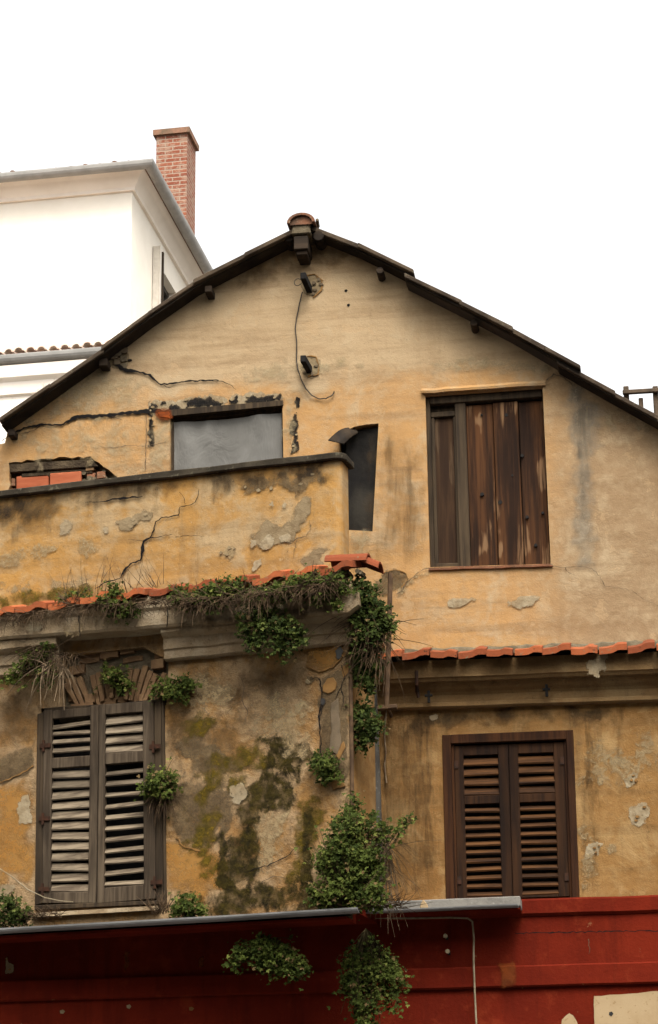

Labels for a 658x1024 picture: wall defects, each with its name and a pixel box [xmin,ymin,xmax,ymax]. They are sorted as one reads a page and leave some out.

crack [2,364,235,471]
flaking render [147,391,300,454]
damp [0,497,58,524]
crack [90,490,199,588]
spalling [241,472,328,572]
peeling [16,795,32,824]
spalling [172,733,247,851]
damp [216,830,228,888]
damp [243,818,257,896]
damp [266,741,294,809]
damp [301,806,314,884]
peeling [628,802,650,827]